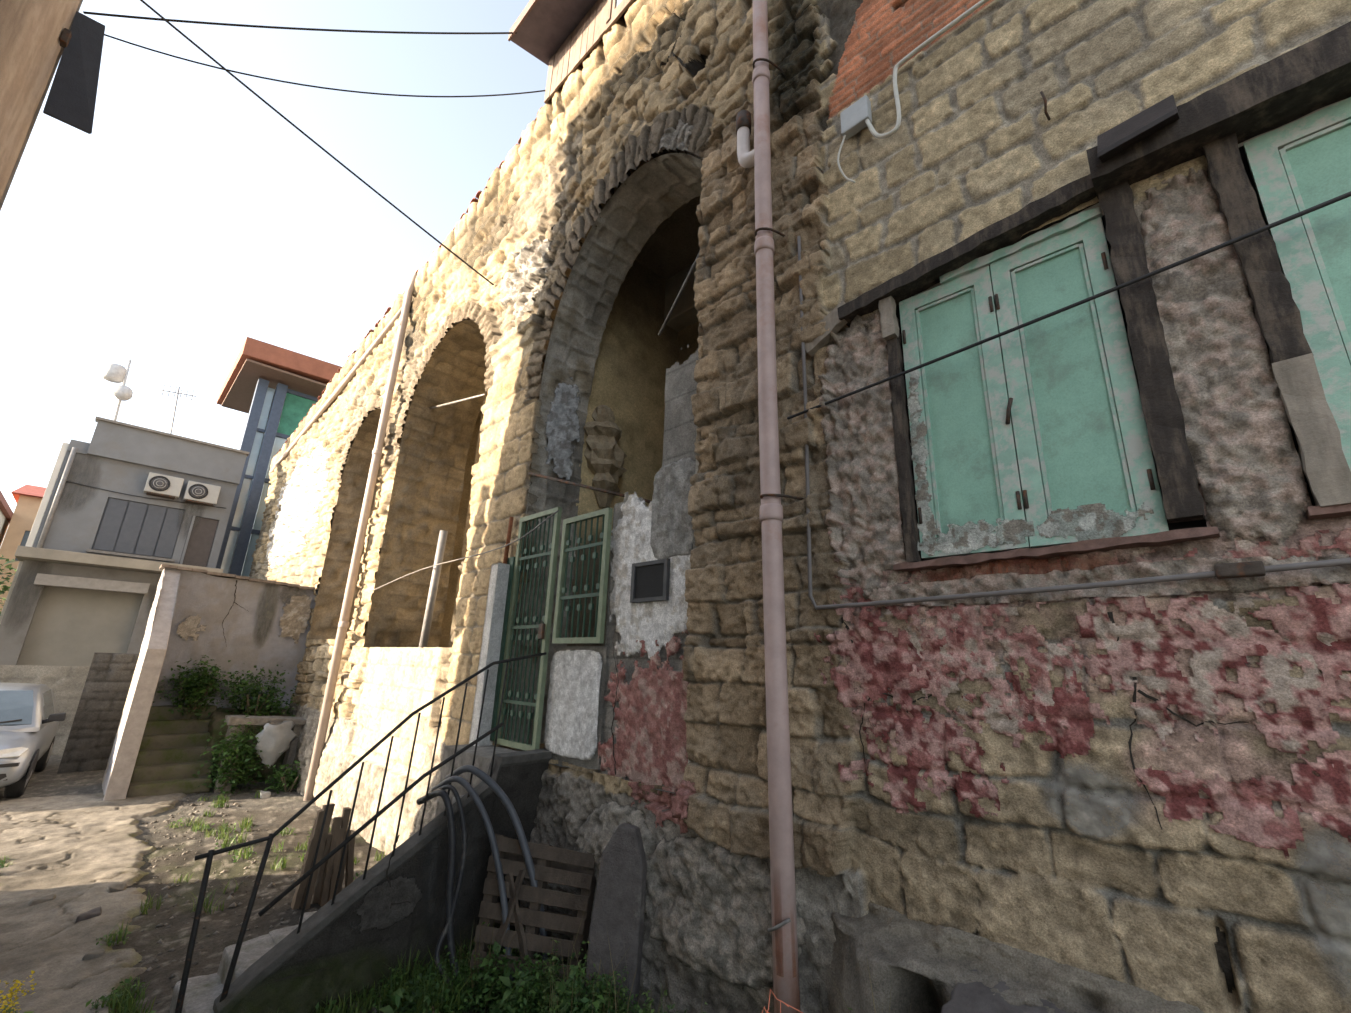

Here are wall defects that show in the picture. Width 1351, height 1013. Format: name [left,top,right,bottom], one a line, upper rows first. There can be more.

peeling [598,492,697,834]
flaking render [814,167,1351,859]
crack [1107,612,1119,641]
crack [1128,677,1249,829]